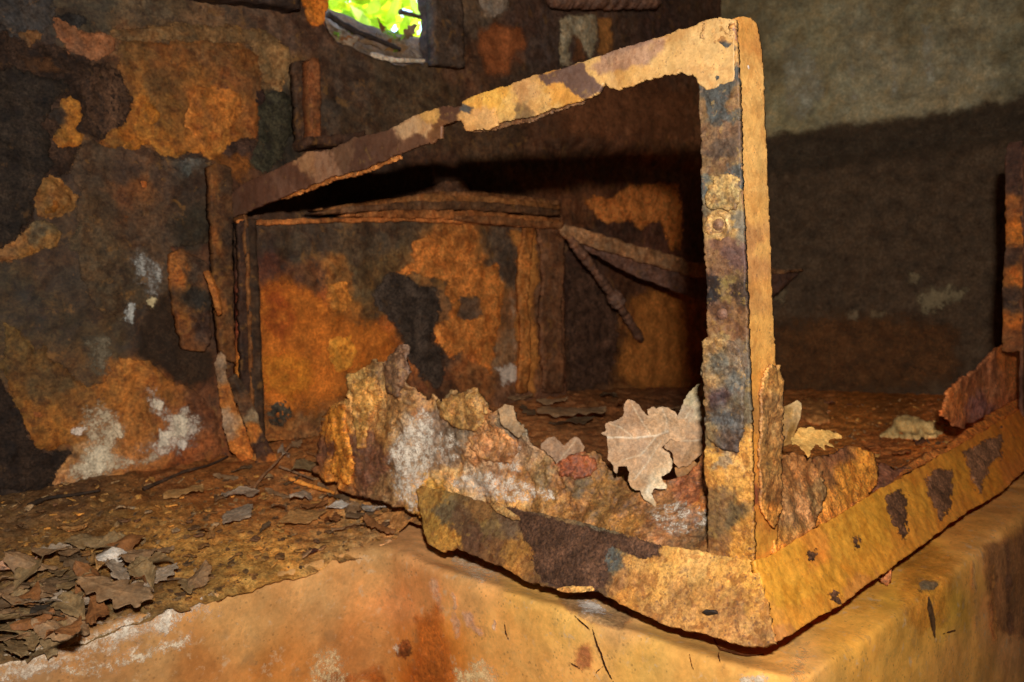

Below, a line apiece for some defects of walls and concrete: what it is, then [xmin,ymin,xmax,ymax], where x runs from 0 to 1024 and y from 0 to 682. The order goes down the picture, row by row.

corrosion [0,17,291,322]
corrosion [260,278,394,418]
corrosion [395,230,540,394]
damp [61,392,201,483]
crack [571,616,614,682]